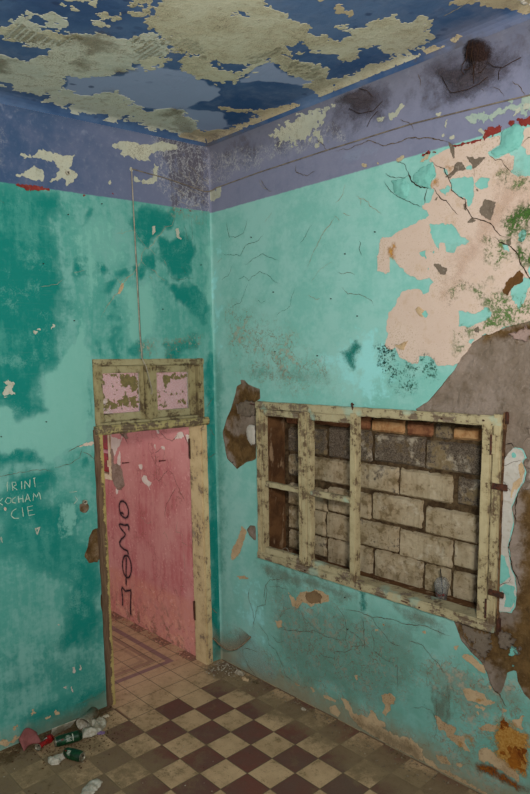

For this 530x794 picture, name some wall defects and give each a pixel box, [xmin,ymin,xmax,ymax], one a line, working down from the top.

peeling [449,0,530,15]
peeling [0,0,462,186]
crack [218,214,294,315]
crack [301,189,380,301]
crack [317,120,530,279]
peeling [2,380,15,398]
flaking render [223,380,260,469]
water stain [377,345,437,390]
peeling [376,96,530,715]
crack [239,578,445,683]
peeling [435,715,519,783]
rust [477,718,530,791]